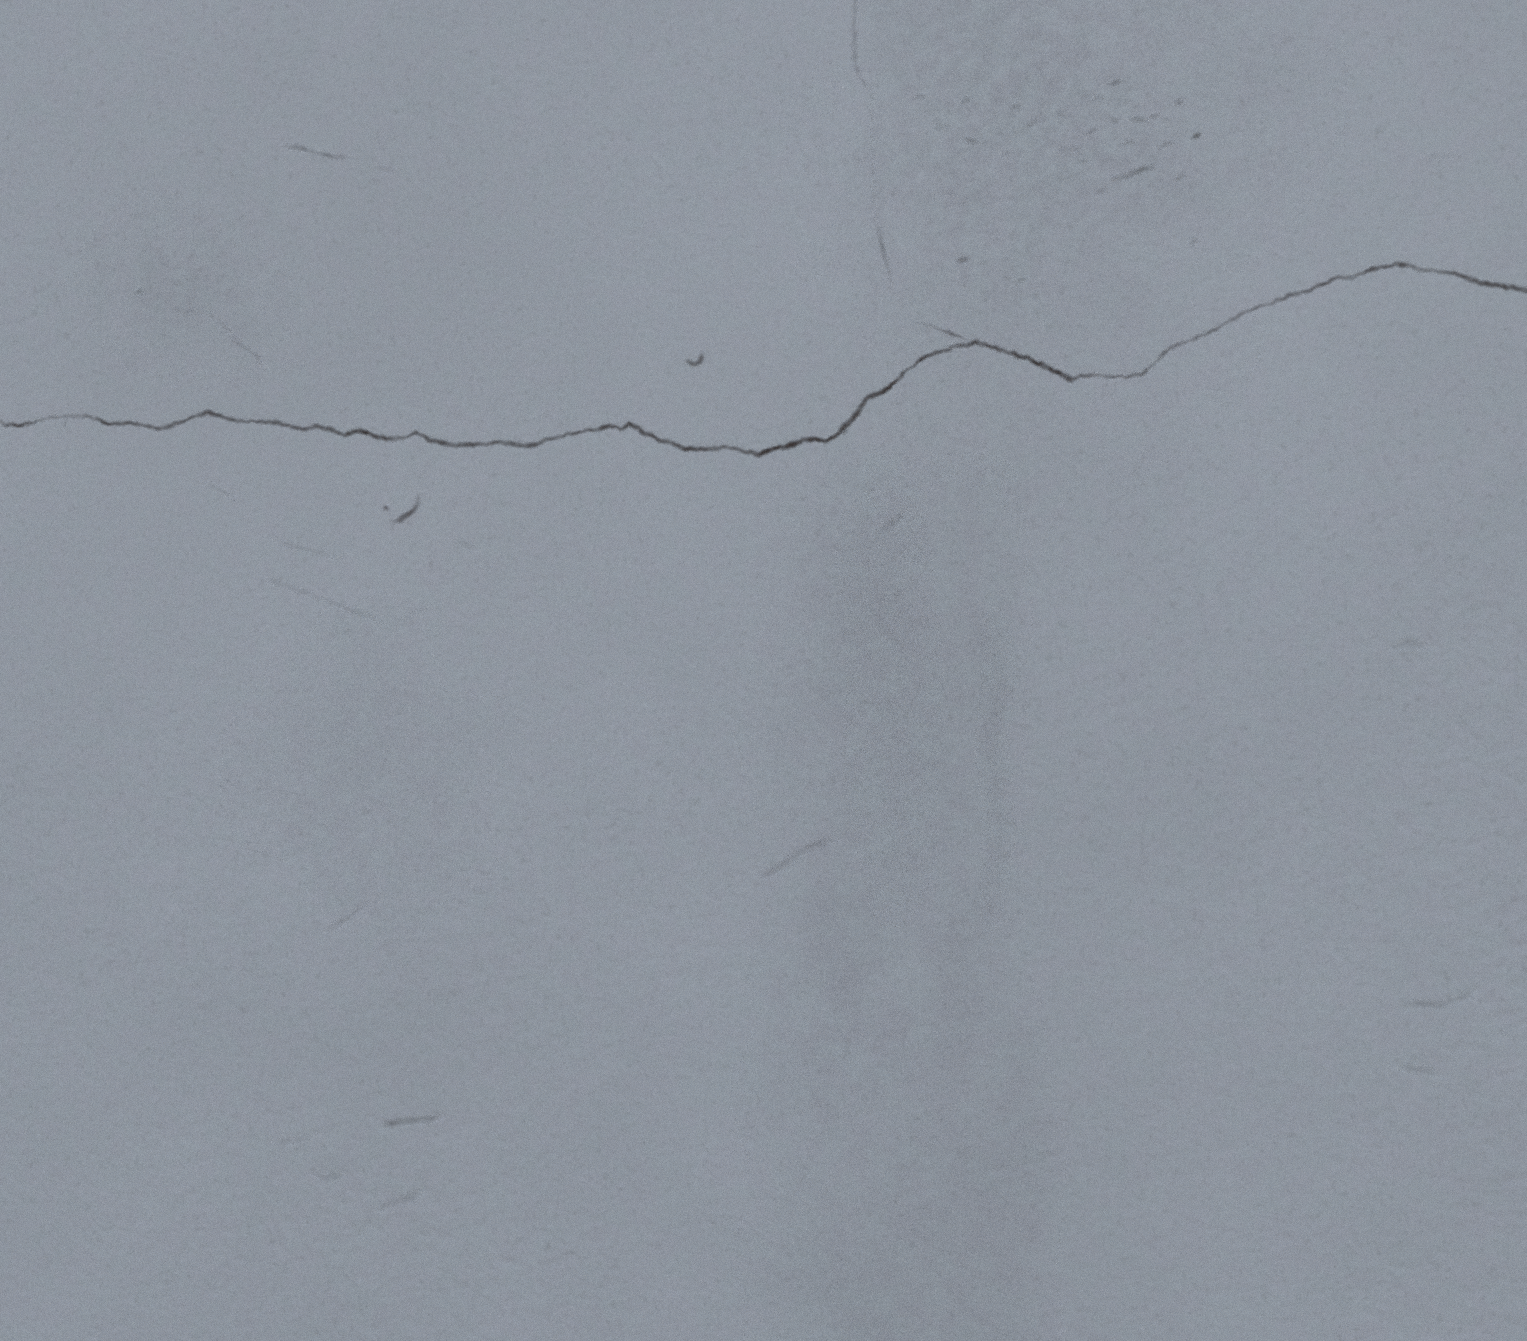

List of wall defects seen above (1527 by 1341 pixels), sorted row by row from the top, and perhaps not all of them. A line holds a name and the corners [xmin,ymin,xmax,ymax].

crack [1455,273,1520,290]
crack [746,340,1072,456]
crack [184,411,536,447]
crack [572,422,708,451]